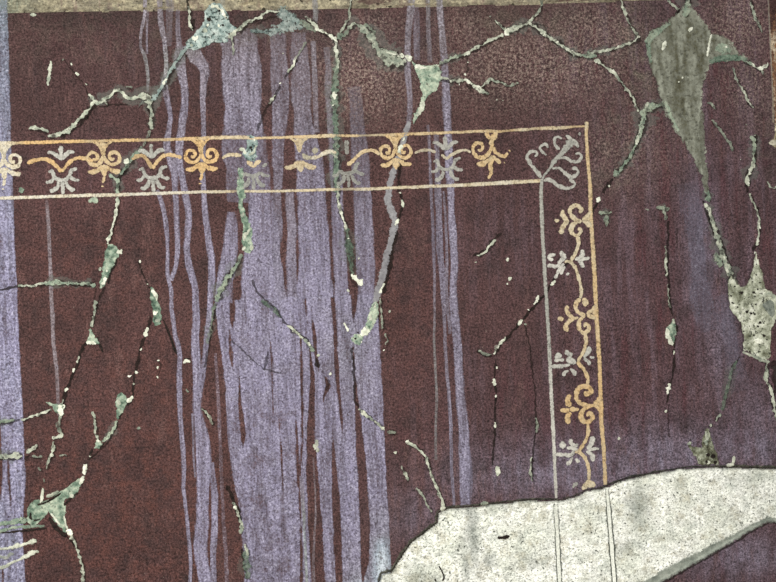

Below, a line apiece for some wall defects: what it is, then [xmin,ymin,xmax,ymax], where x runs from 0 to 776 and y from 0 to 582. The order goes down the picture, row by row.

water stain [0,0,26,582]
crack [0,270,108,480]
crack [29,47,187,244]
water stain [139,0,150,87]
water stain [156,0,391,582]
crack [228,0,415,351]
water stain [426,0,470,506]
crack [439,0,667,221]
spalling [665,319,678,348]
spalling [644,6,748,192]
spalling [728,254,776,363]
spalling [377,428,776,582]